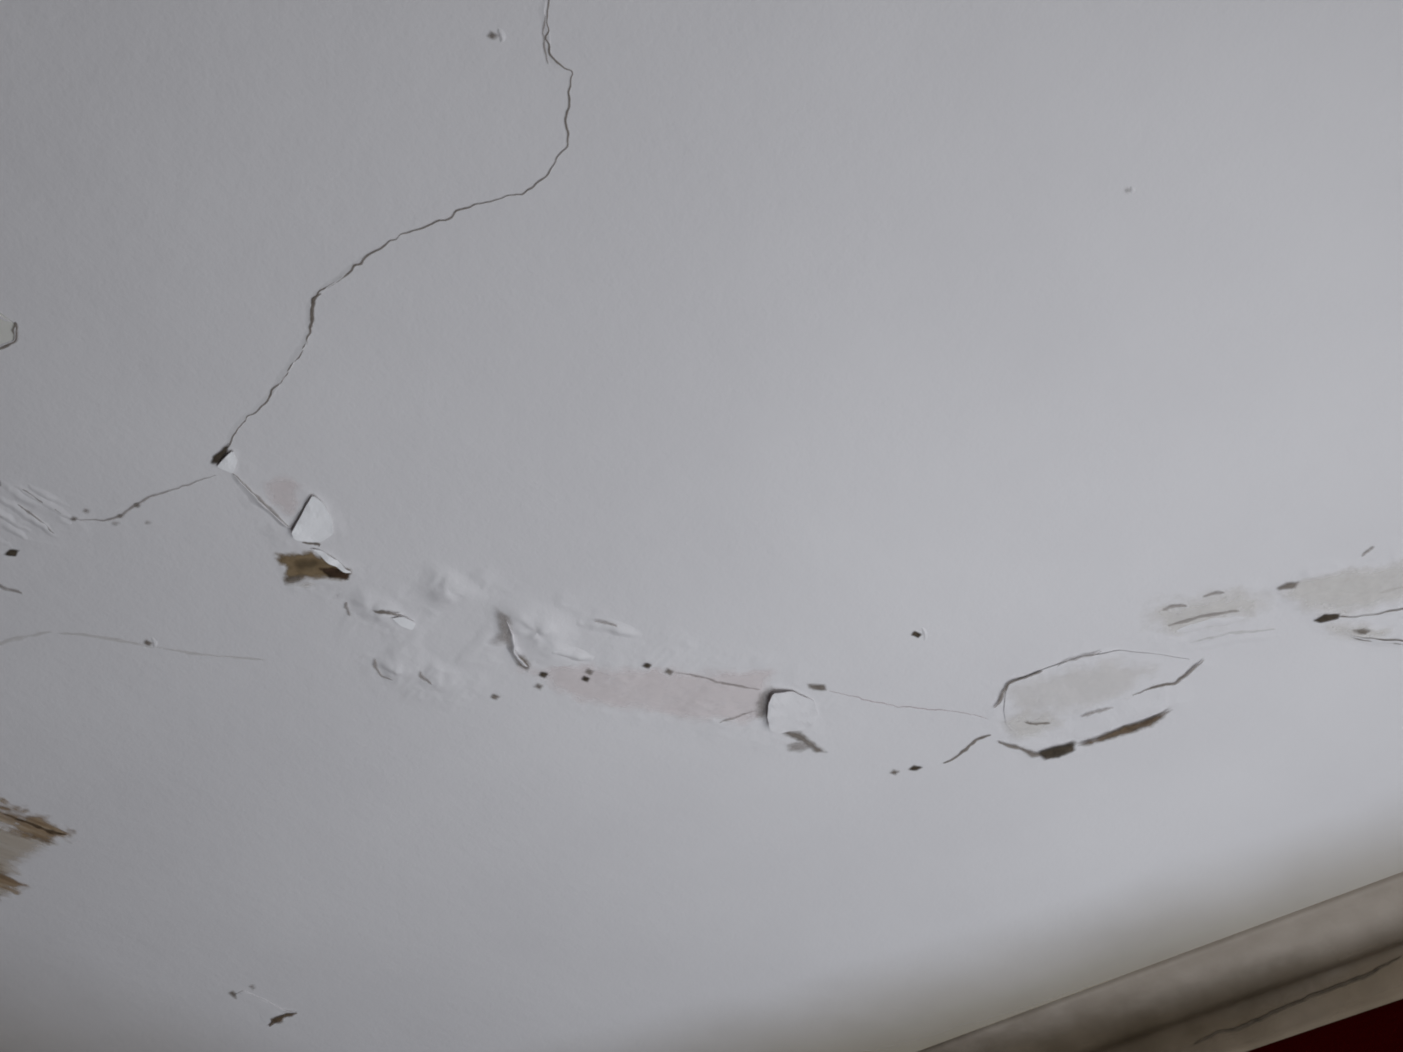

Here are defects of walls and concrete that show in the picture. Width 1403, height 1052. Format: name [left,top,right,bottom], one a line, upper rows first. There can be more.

crack [72,0,573,521]
peeling [0,314,17,350]
peeling [1260,535,1403,657]
peeling [537,613,849,756]
flaking render [945,623,1225,769]
flaking render [0,799,68,895]
peeling [230,991,297,1027]